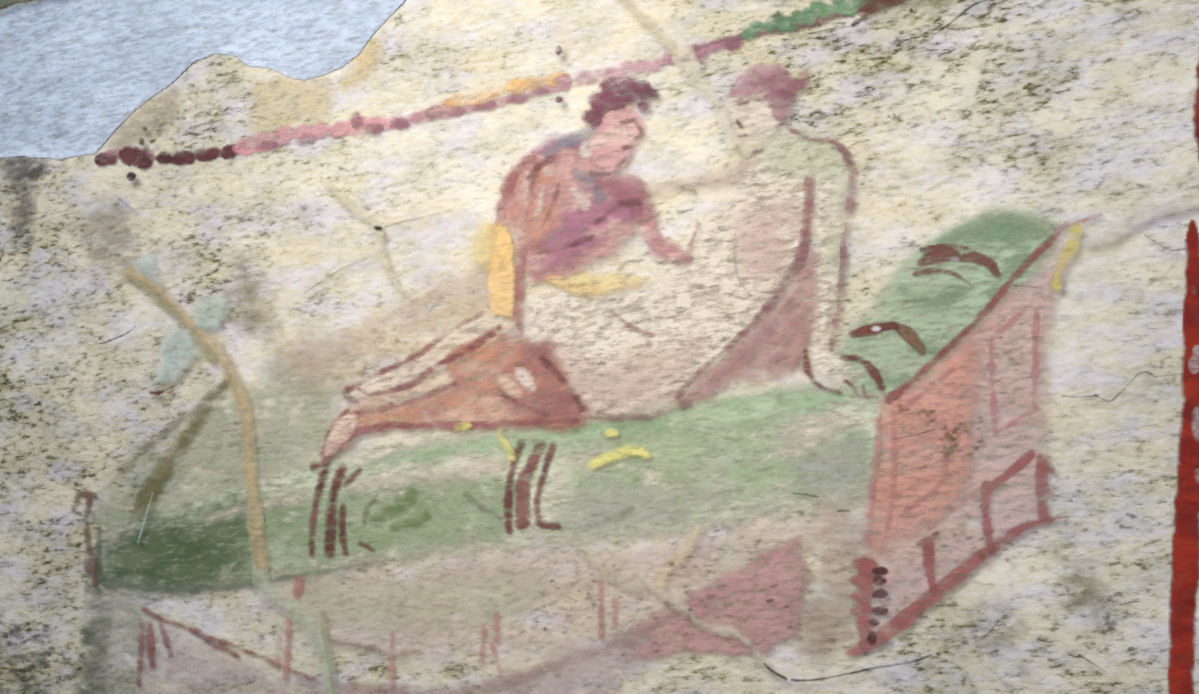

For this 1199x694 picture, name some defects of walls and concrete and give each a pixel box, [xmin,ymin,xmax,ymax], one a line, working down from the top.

crack [939,1,983,31]
crack [568,526,932,682]